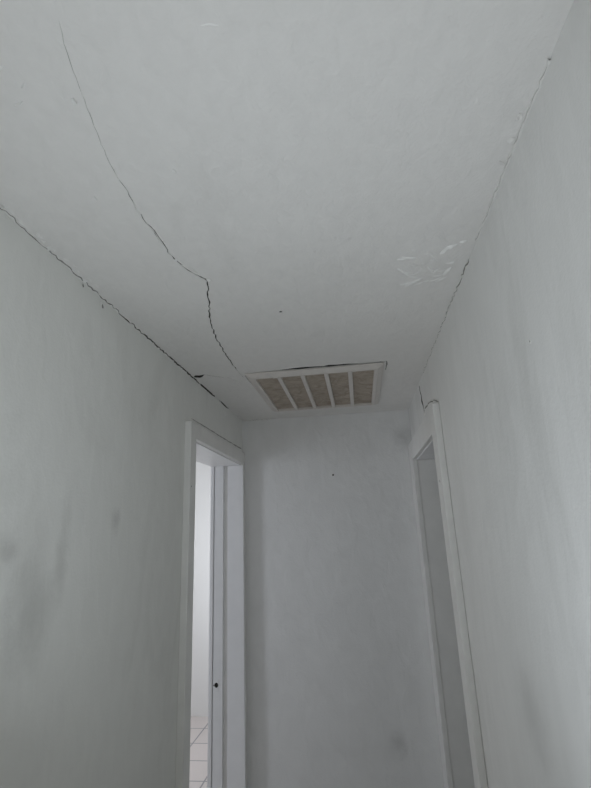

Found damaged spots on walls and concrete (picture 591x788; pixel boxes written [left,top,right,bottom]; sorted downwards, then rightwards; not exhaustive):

crack [59,21,244,378]
crack [0,205,229,416]
crack [191,418,242,450]